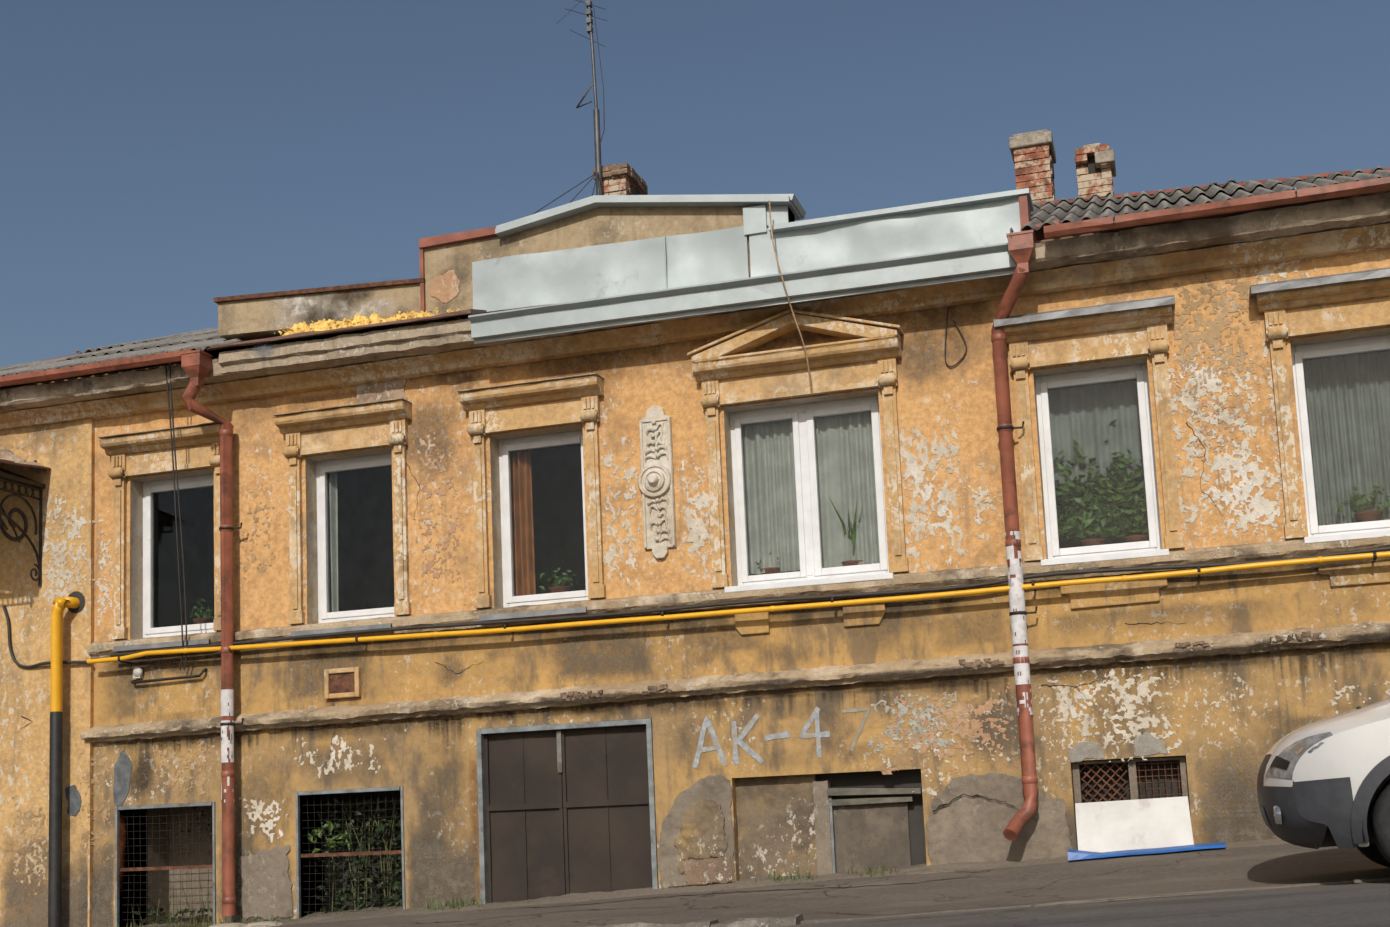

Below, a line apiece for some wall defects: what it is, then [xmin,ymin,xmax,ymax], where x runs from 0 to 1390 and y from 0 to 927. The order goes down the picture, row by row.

spalling [430,270,460,303]
peeling [1165,259,1316,544]
peeling [601,437,640,596]
peeling [678,443,712,578]
peeling [899,417,1002,573]
peeling [239,797,288,843]
peeling [281,735,386,779]
peeling [1038,666,1193,764]